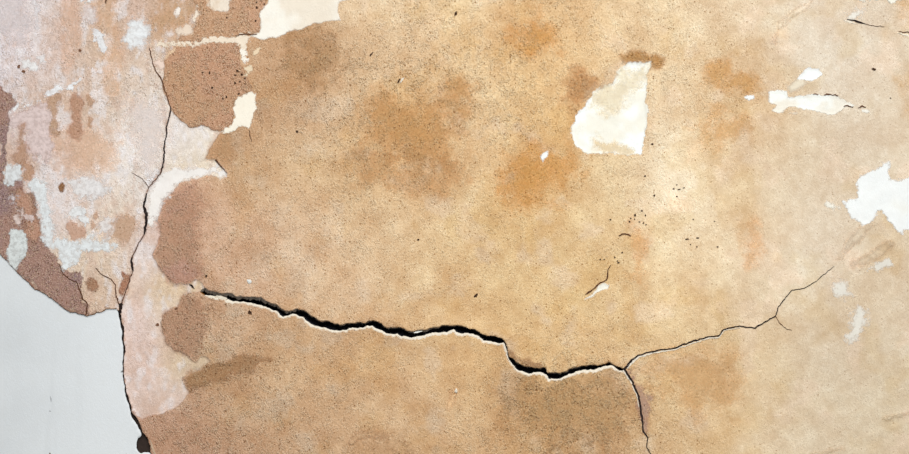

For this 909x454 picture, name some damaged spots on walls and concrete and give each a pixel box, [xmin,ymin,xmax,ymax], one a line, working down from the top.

damp [161,0,266,130]
peeling [0,0,200,316]
crack [59,264,88,315]
damp [114,215,135,241]
crack [96,48,172,454]
damp [156,194,201,283]
damp [162,297,204,354]
damp [186,355,270,391]
crack [189,266,834,454]
damp [508,350,542,368]